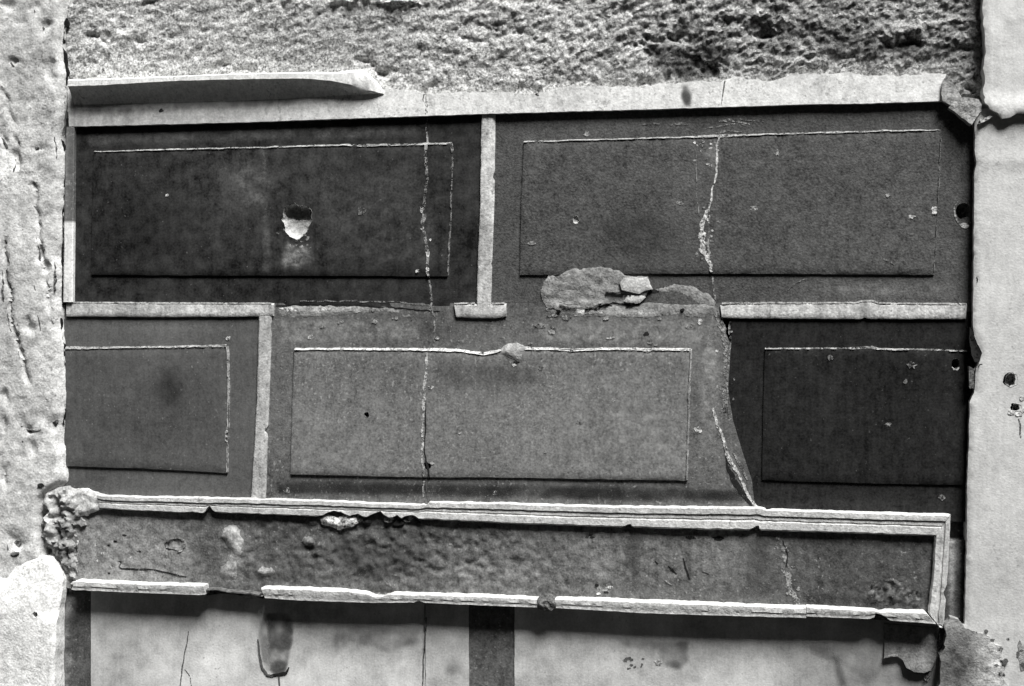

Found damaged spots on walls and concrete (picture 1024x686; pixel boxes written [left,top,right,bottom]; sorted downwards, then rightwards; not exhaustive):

crack [415,93,438,501]
flaking render [534,267,717,334]
crack [676,138,757,506]
spalling [37,483,91,592]
spalling [320,514,371,530]
spalling [384,516,421,526]
damp [257,615,293,686]
flaking render [883,615,1024,686]